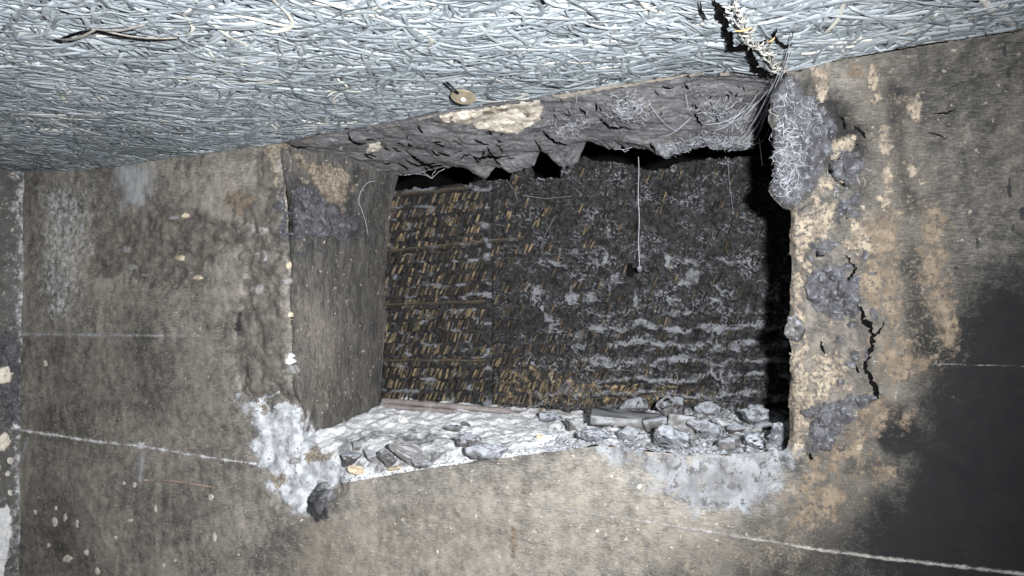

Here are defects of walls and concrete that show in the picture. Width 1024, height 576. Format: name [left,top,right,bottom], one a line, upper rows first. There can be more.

spalling [418,73,705,134]
spalling [366,141,382,154]
spalling [395,166,512,190]
spalling [532,152,562,179]
spalling [579,122,774,172]
damp [853,201,961,386]
crack [856,304,885,399]
peeling [303,445,334,464]